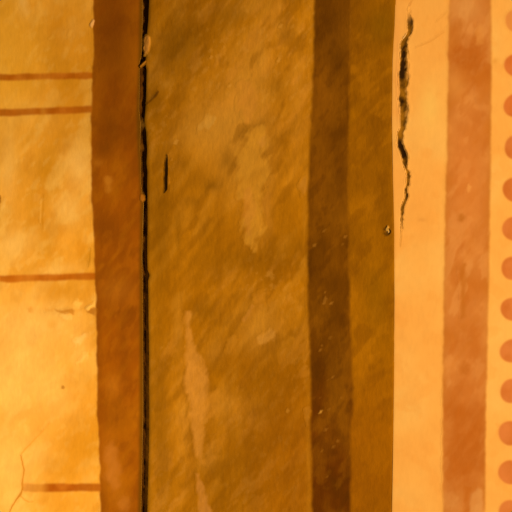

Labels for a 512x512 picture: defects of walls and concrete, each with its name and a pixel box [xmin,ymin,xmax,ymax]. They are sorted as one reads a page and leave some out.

crack [139,0,160,512]
crack [396,0,414,247]